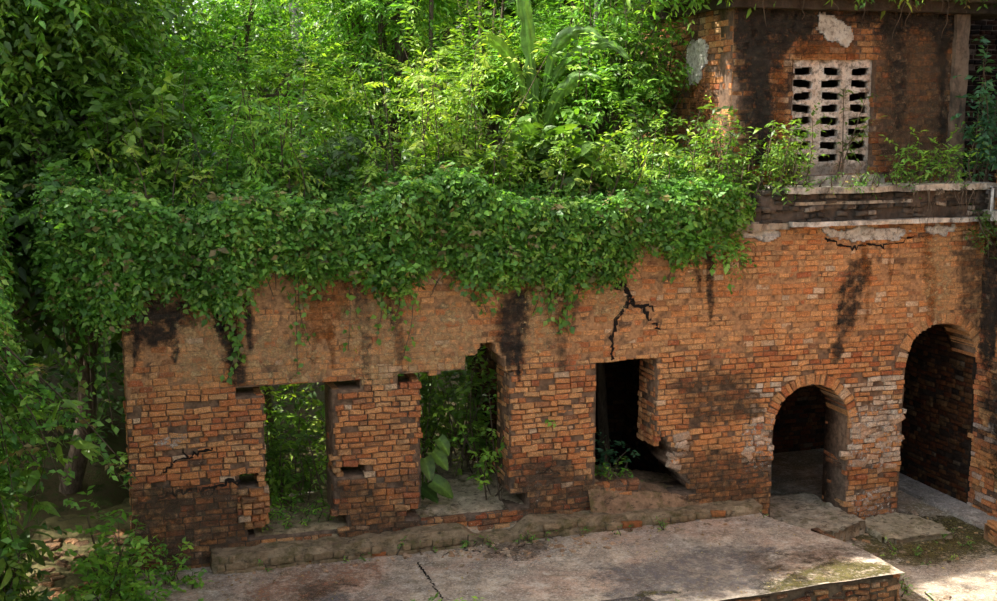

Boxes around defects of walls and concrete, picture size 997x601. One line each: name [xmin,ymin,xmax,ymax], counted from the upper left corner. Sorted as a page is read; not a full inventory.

peeling [815,12,854,48]
peeling [684,38,714,124]
damp [733,8,954,174]
crack [608,279,661,360]